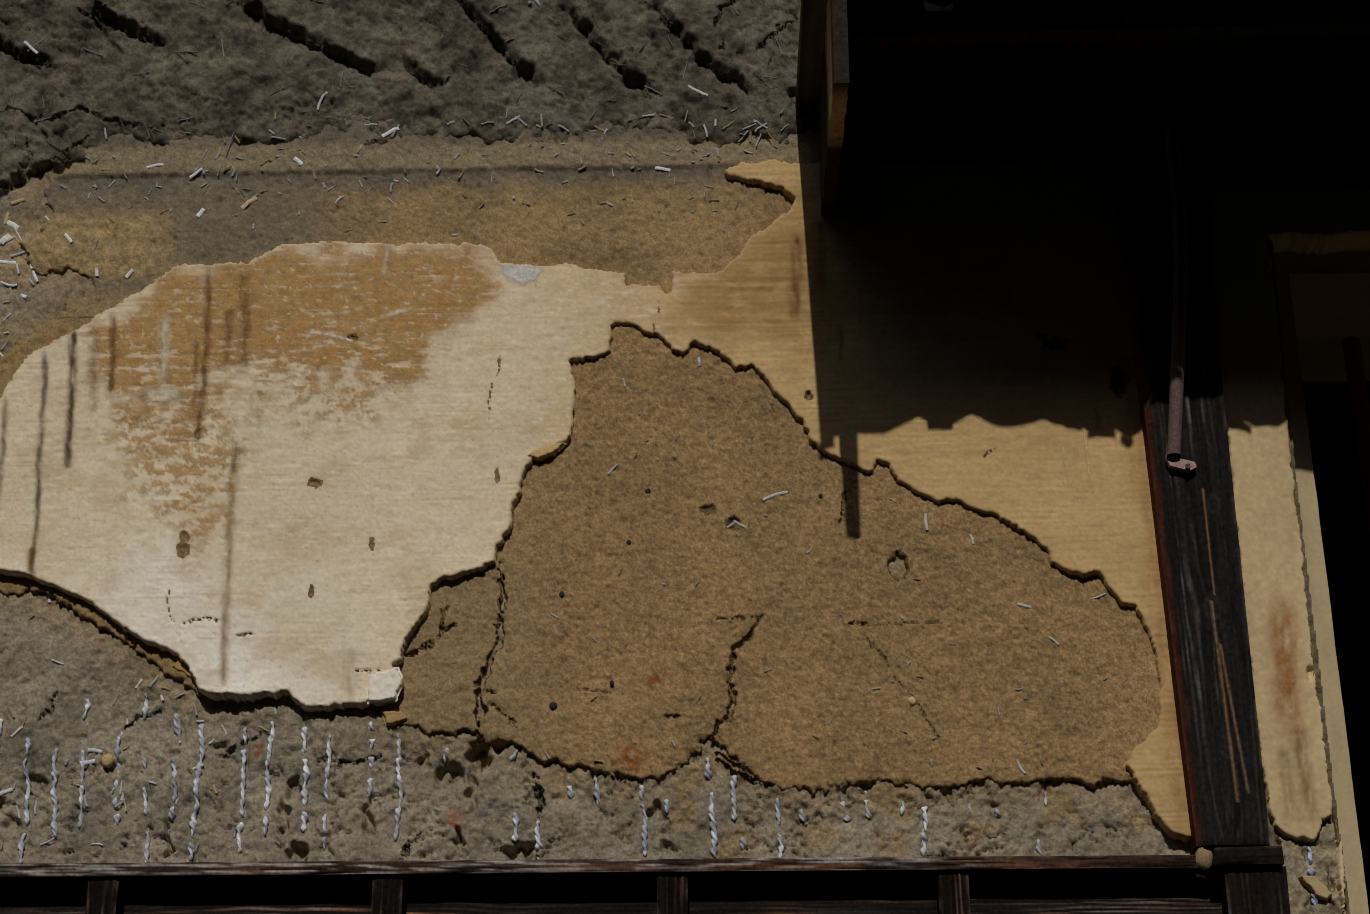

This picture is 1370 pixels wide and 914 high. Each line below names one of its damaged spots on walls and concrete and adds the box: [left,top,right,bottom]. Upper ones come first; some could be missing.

spalling [0,111,820,398]
water stain [65,244,497,578]
water stain [29,432,42,569]
spalling [0,575,204,697]
crack [355,605,458,673]
crack [473,561,517,746]
crack [574,686,612,694]
crack [710,614,763,780]
spalling [367,324,1160,796]
spalling [1277,822,1345,914]